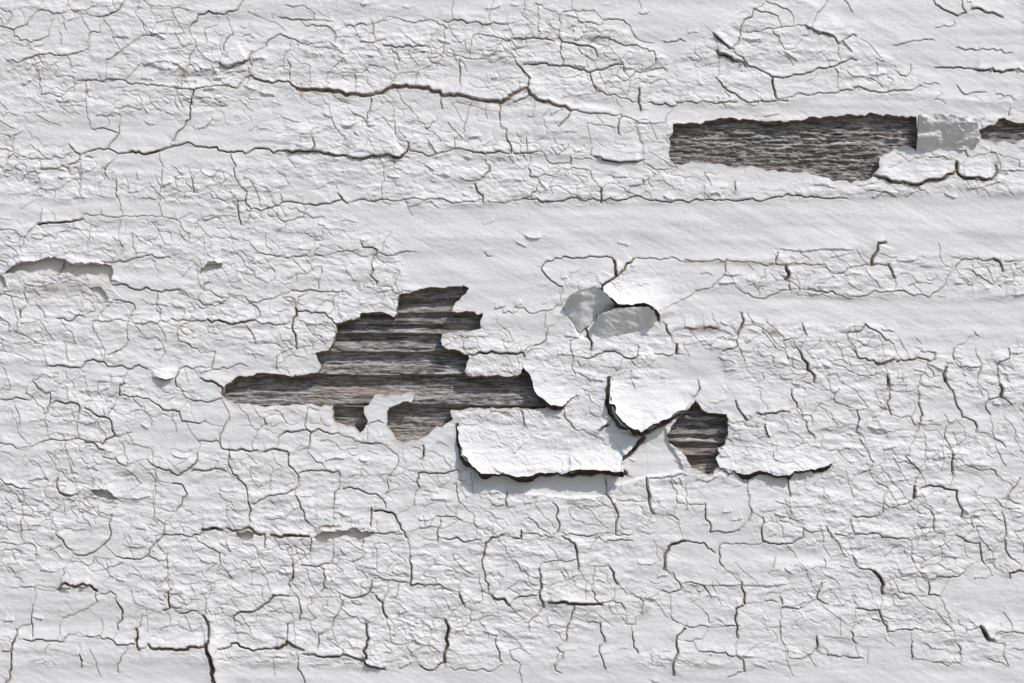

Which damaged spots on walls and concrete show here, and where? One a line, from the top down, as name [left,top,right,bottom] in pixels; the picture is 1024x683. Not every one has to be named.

crack [0,0,1024,226]
peeling [669,112,1024,183]
peeling [0,257,113,301]
crack [60,254,339,369]
crack [255,246,409,284]
crack [515,242,1021,375]
peeling [222,285,832,483]
crack [0,324,1024,683]